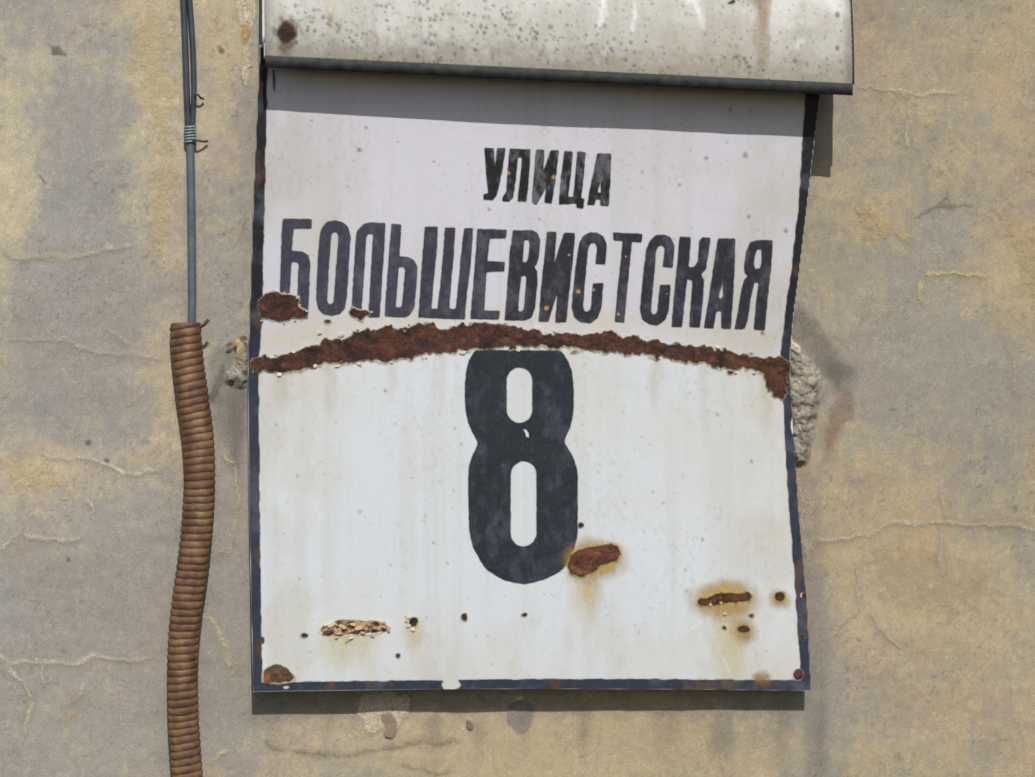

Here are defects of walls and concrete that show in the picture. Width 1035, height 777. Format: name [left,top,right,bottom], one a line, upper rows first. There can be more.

crack [0,533,80,554]
crack [813,491,1035,576]
crack [0,651,149,735]